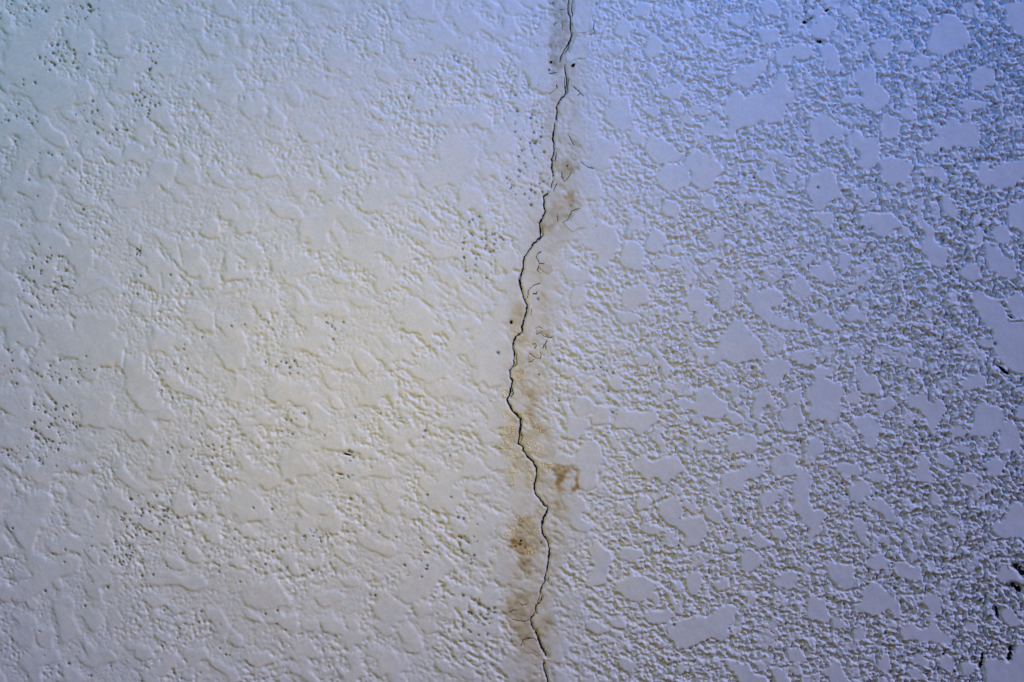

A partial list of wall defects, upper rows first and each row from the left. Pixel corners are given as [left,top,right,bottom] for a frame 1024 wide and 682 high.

water stain [488,0,599,682]
crack [506,0,595,682]